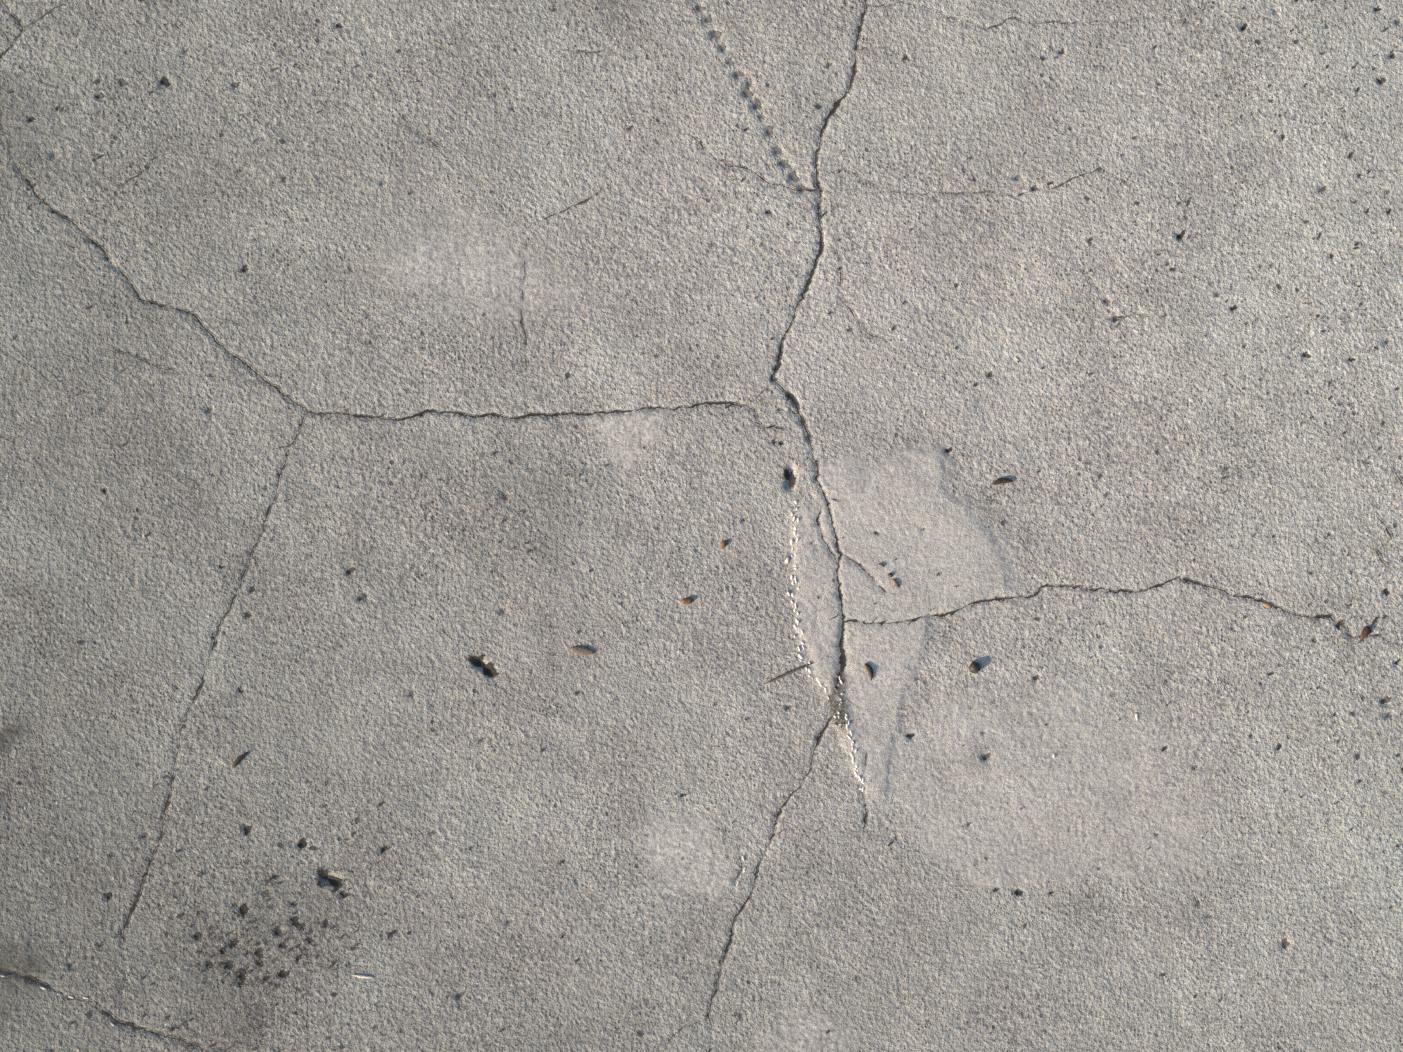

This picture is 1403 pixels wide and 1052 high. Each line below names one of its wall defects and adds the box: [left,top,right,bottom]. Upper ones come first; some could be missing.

crack [0,0,67,59]
crack [386,71,477,183]
crack [6,139,110,261]
crack [540,188,603,222]
crack [106,349,185,373]
crack [662,0,1360,1052]
crack [118,238,785,952]
crack [0,969,239,1052]